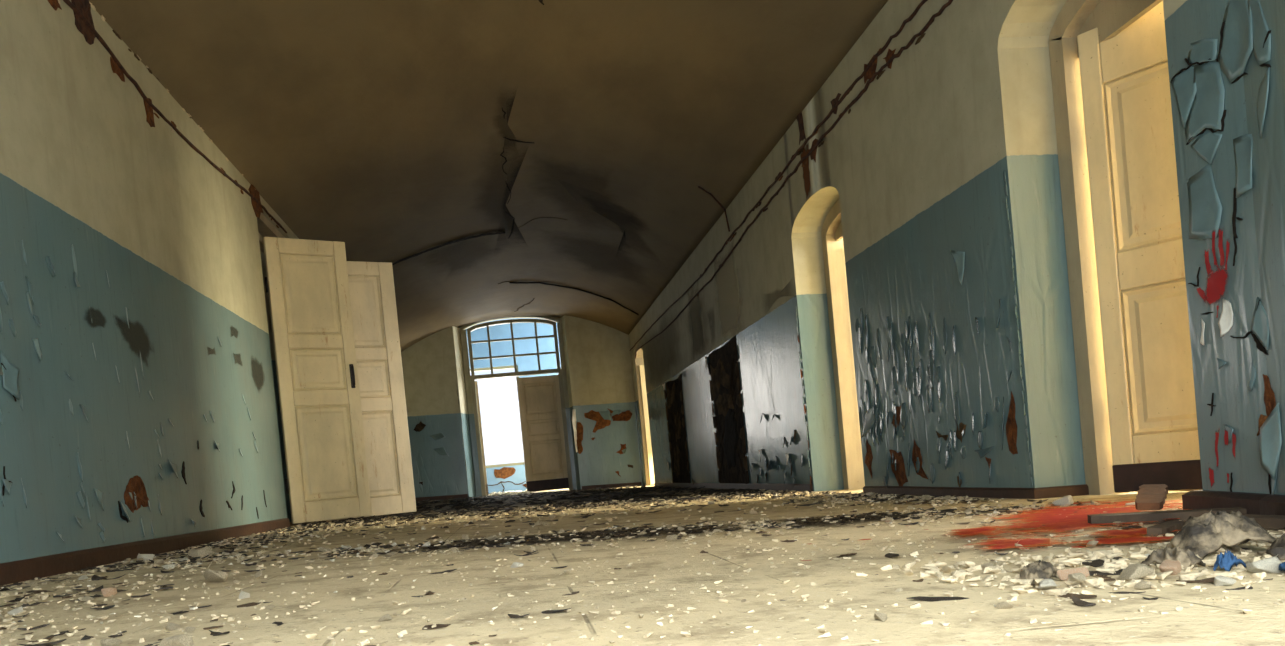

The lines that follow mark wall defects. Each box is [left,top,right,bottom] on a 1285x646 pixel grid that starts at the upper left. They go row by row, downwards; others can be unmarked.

crack [500,108,566,239]
corrosion [800,143,811,201]
peeling [1171,0,1271,239]
water stain [86,308,151,365]
peeling [855,170,1033,489]
peeling [1200,299,1233,345]
peeling [120,475,162,538]
peeling [494,467,527,488]
peeling [572,409,632,454]
peeling [663,373,694,485]
peeling [705,307,812,487]
peeling [1248,297,1282,495]